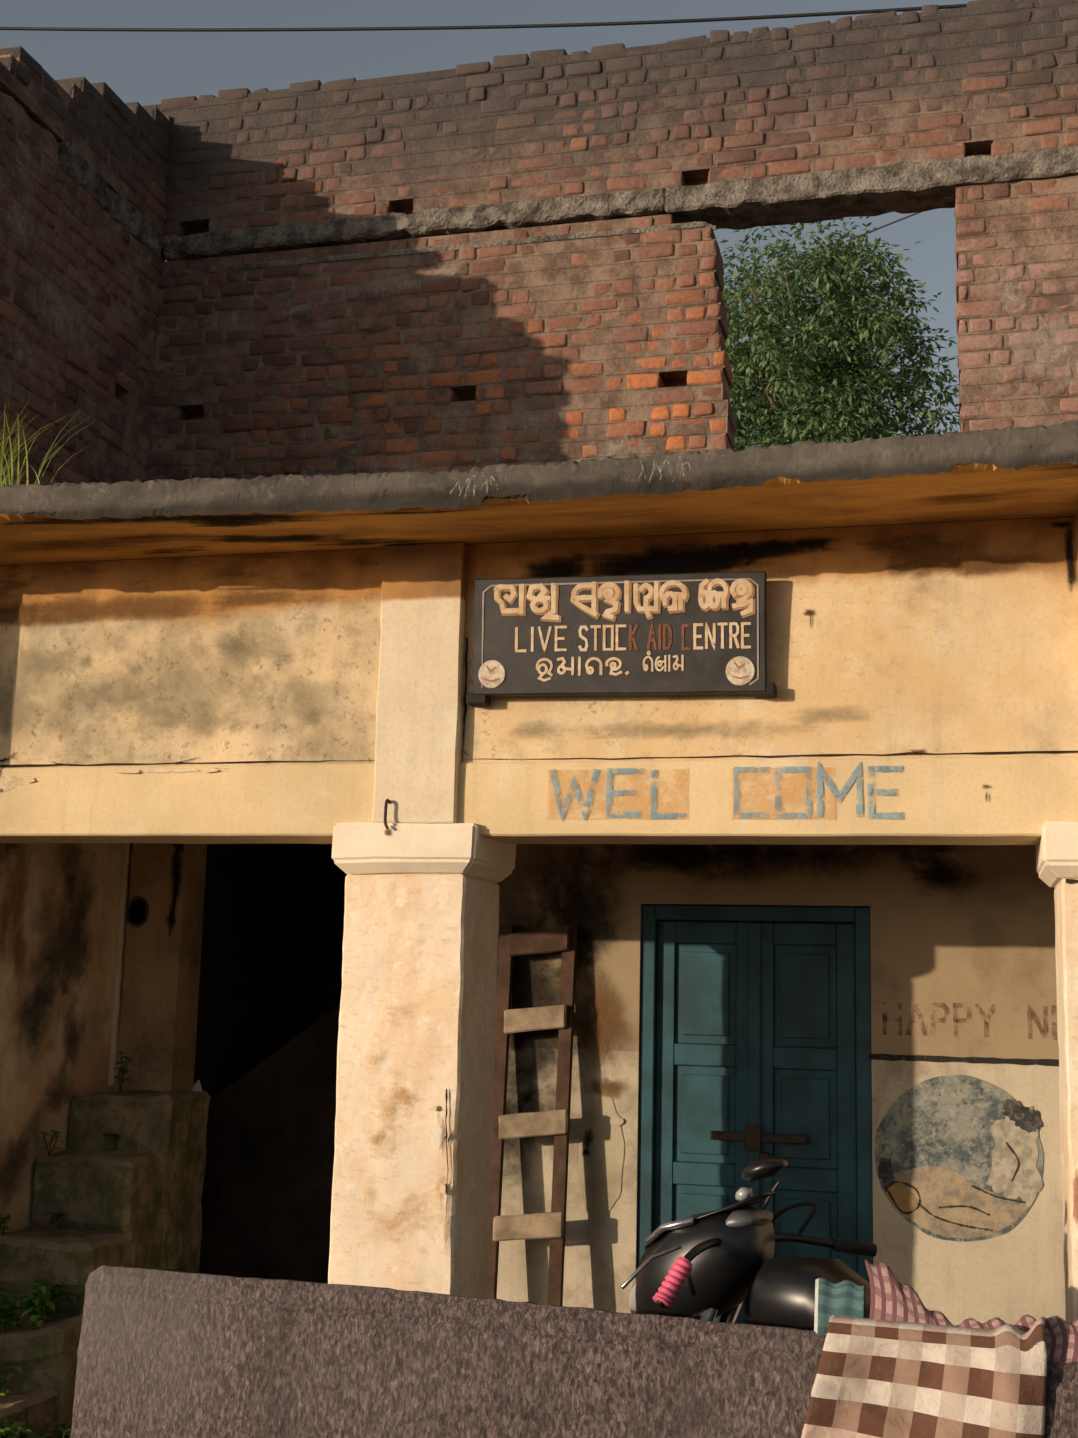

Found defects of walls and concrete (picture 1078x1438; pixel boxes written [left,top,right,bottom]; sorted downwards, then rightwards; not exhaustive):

leakage [871,536,1032,574]
leakage [0,597,196,624]
leakage [228,592,283,605]
leakage [0,843,92,1045]
leakage [0,1114,37,1200]